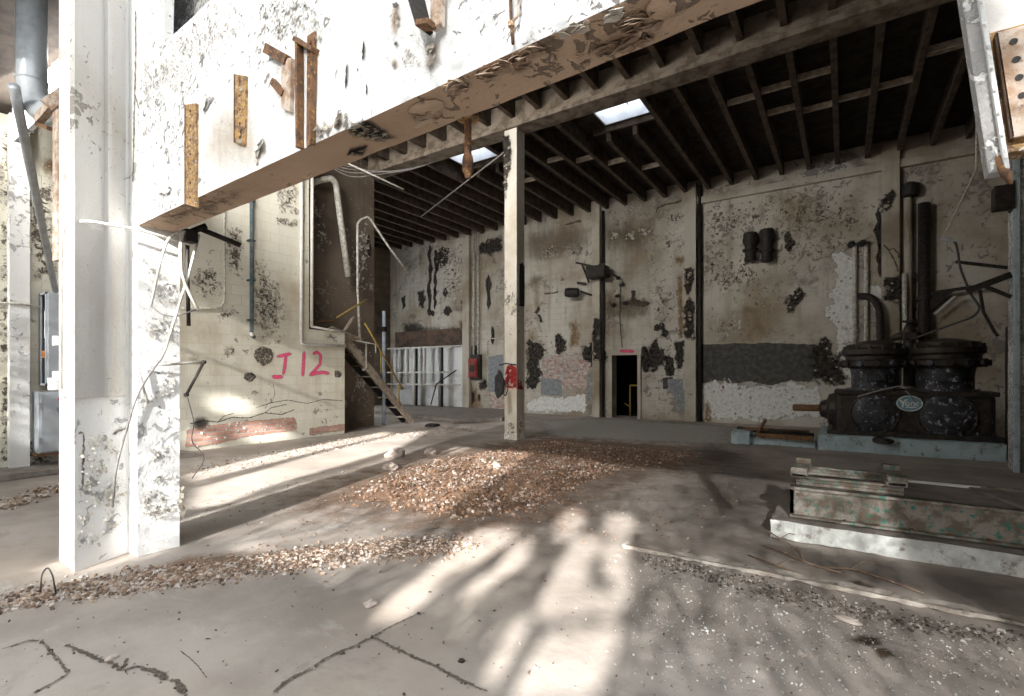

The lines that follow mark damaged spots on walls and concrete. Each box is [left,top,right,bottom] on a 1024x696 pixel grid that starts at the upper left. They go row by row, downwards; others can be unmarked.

peeling [558,20,590,39]
peeling [593,7,664,61]
peeling [440,43,549,95]
peeling [605,201,685,267]
flaking render [649,191,899,423]
spalling [185,417,297,447]
crack [190,384,342,424]
spalling [488,352,596,437]
peeling [77,434,185,547]
crack [3,639,207,696]
crack [273,612,487,693]